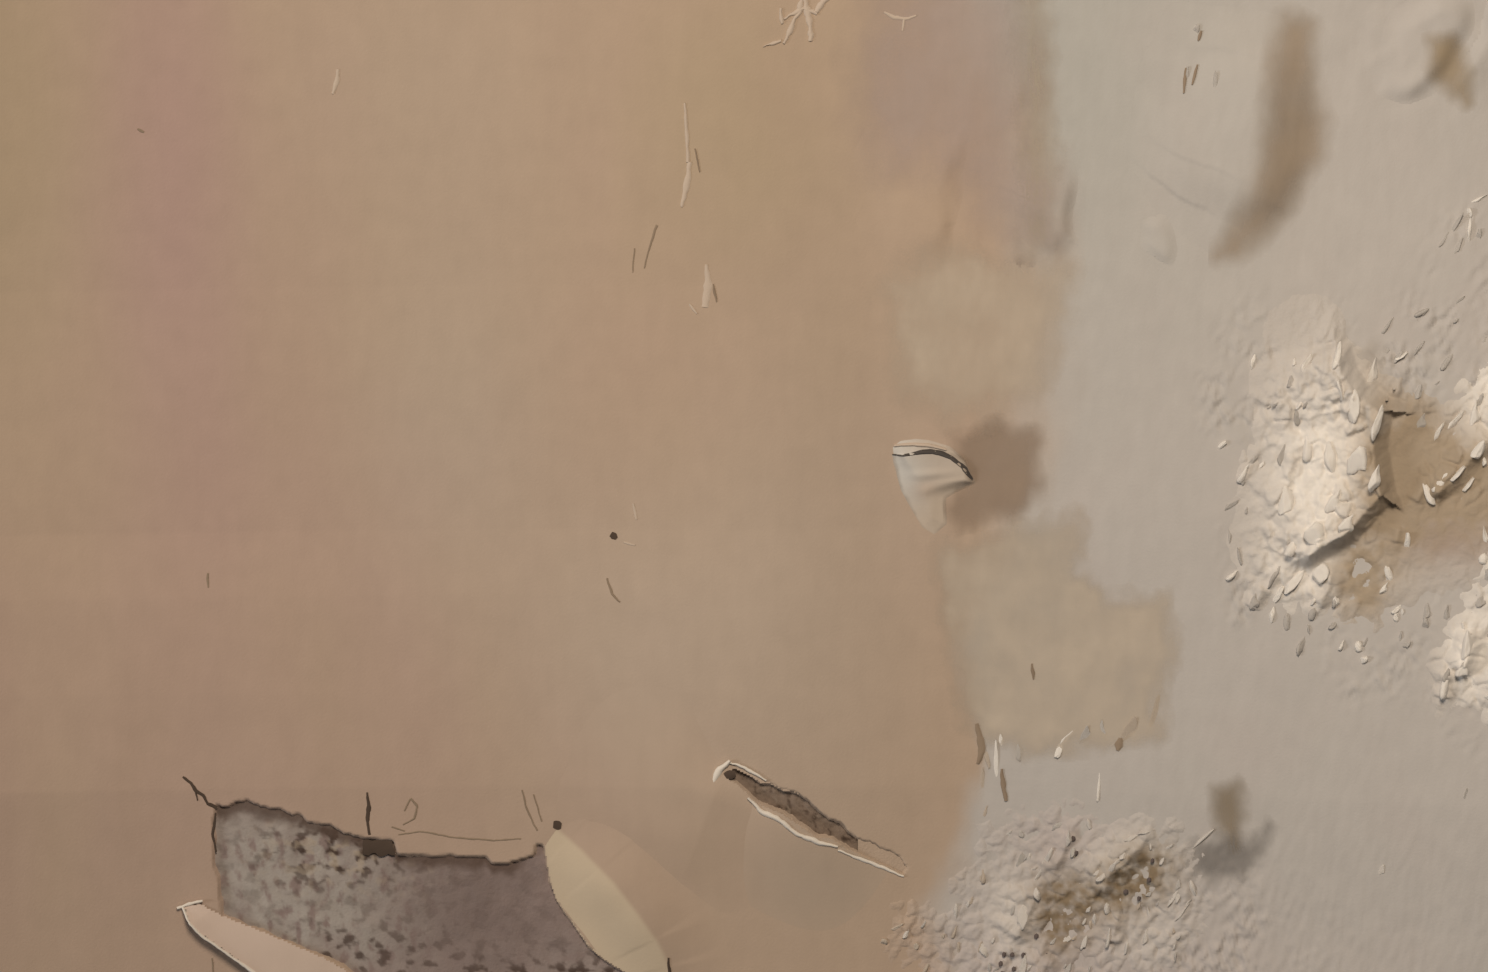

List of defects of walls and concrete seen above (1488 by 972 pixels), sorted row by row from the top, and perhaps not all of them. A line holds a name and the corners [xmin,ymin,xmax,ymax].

water stain [954,425,1034,520]
spalling [1218,294,1488,727]
peeling [177,686,906,972]
spalling [872,723,1215,972]
water stain [941,527,1168,752]
peeling [1054,695,1160,759]